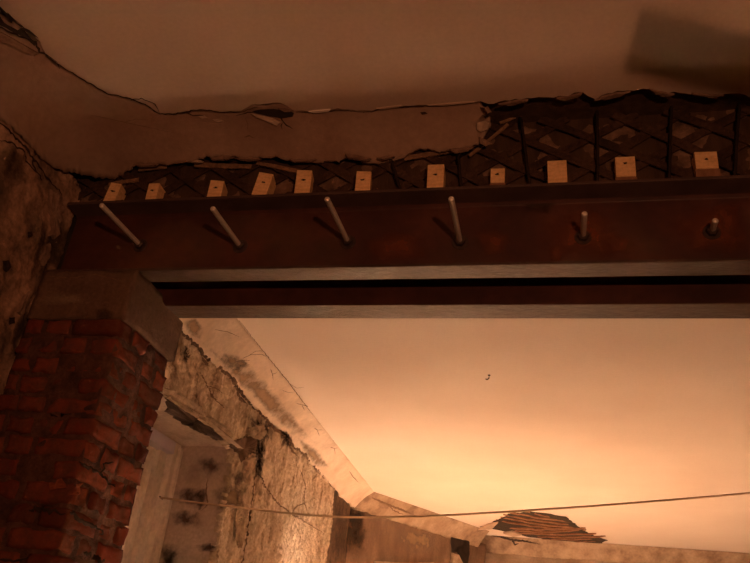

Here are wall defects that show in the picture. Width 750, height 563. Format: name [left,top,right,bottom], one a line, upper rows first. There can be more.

crack [54,61,255,116]
flaking render [239,108,294,129]
crack [329,105,428,113]
corrosion [684,206,744,248]
leakage [228,358,296,426]
crack [219,320,310,411]
leakage [251,418,291,475]
crack [241,410,335,563]
flaking render [478,511,608,543]